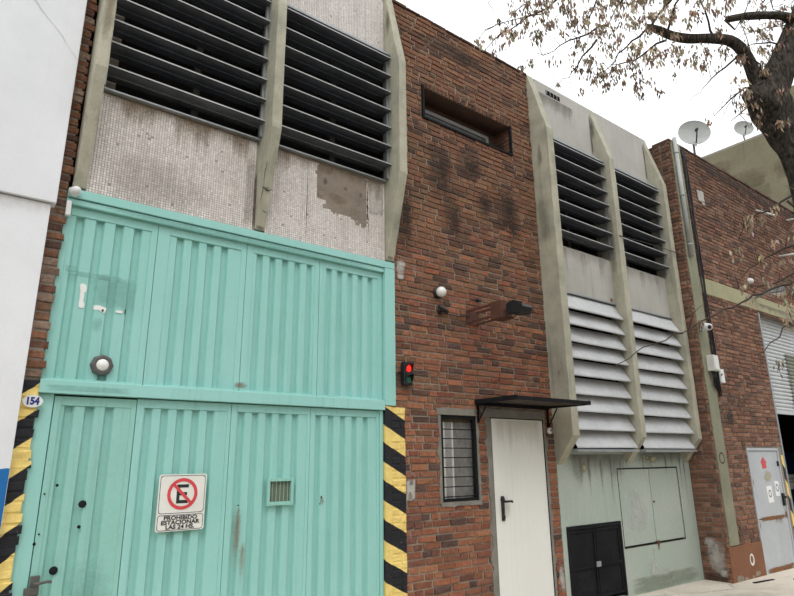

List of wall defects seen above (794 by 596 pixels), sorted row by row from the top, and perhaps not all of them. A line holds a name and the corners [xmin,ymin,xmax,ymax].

spalling [316,162,368,228]
damp [705,538,727,577]